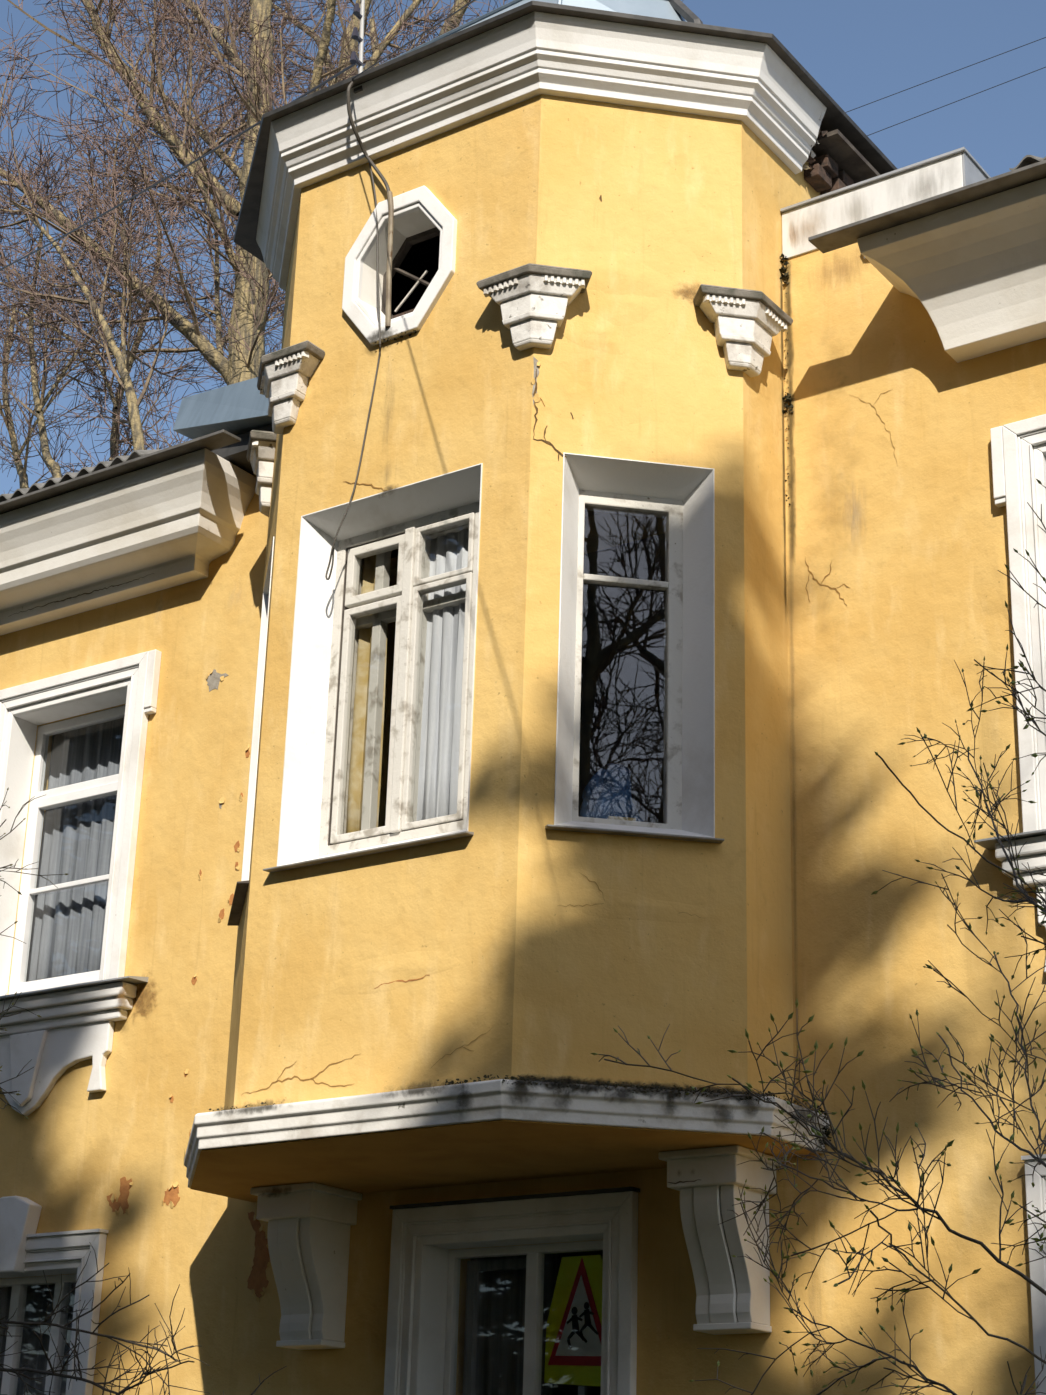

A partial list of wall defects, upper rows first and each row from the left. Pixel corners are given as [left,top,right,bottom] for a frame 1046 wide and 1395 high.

crack [8,573,153,617]
crack [805,561,850,604]
peeling [205,669,228,692]
crack [244,1054,359,1093]
peeling [247,1211,271,1303]